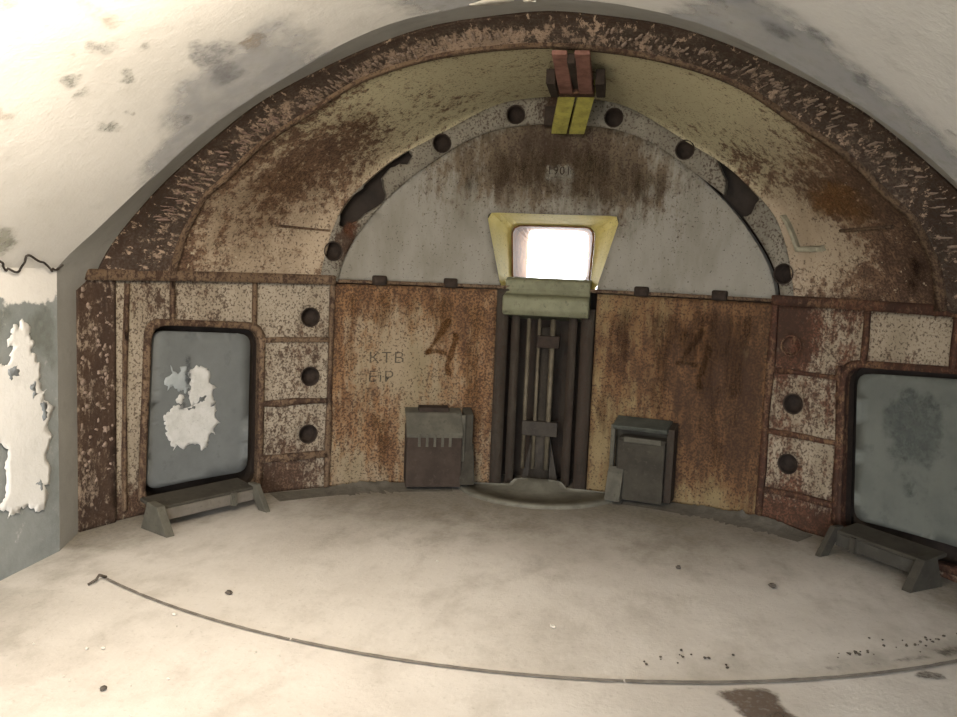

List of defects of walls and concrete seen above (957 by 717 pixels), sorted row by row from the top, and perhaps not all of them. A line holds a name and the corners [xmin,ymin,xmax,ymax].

peeling [0,319,55,517]
peeling [163,365,220,451]
leakage [721,689,796,717]